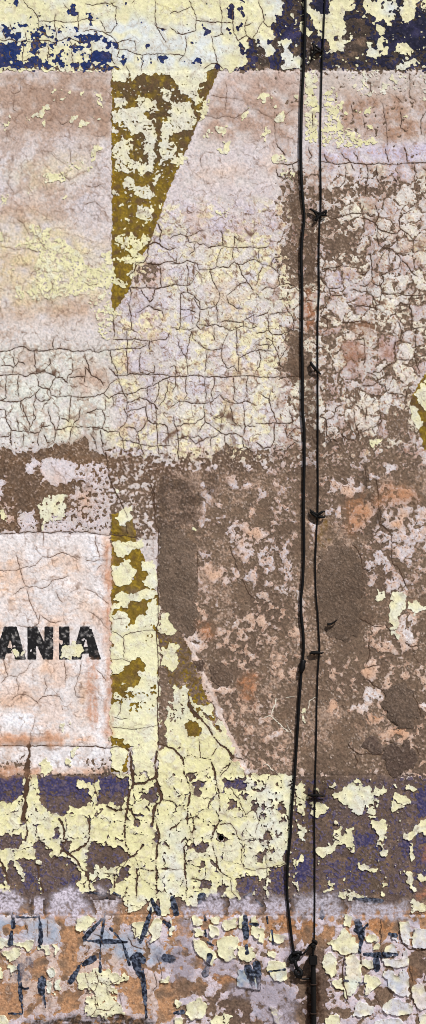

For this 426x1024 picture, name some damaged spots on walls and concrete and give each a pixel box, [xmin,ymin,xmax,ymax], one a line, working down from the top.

peeling [0,0,426,340]
crack [0,74,426,628]
spalling [402,328,426,378]
peeling [60,641,84,660]
crack [1,484,290,900]
crack [264,696,315,733]
spalling [2,924,28,936]
peeling [413,1013,426,1024]